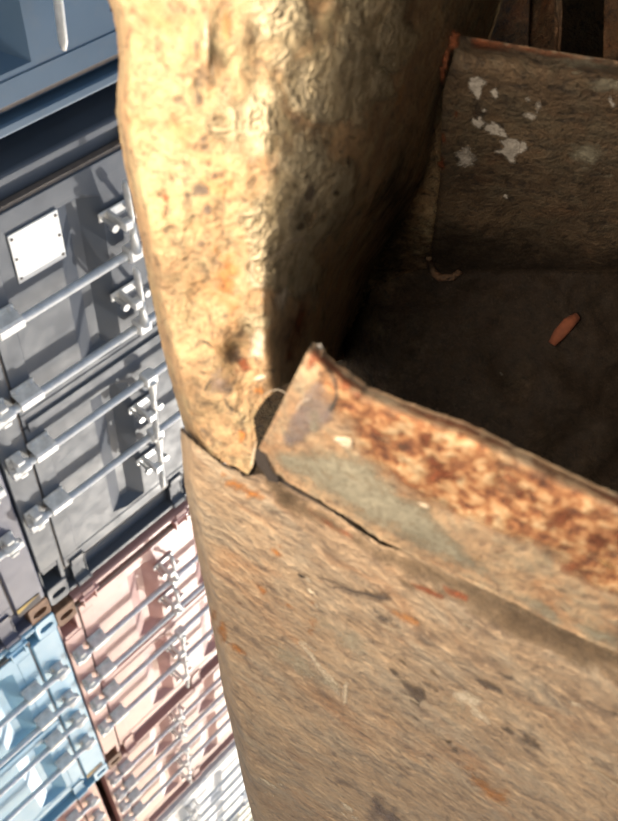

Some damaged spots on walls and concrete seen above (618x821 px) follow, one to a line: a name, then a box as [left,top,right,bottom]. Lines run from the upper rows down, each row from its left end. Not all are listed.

crack [180,427,381,551]
corrosion [308,349,618,593]
corrosion [414,585,467,601]